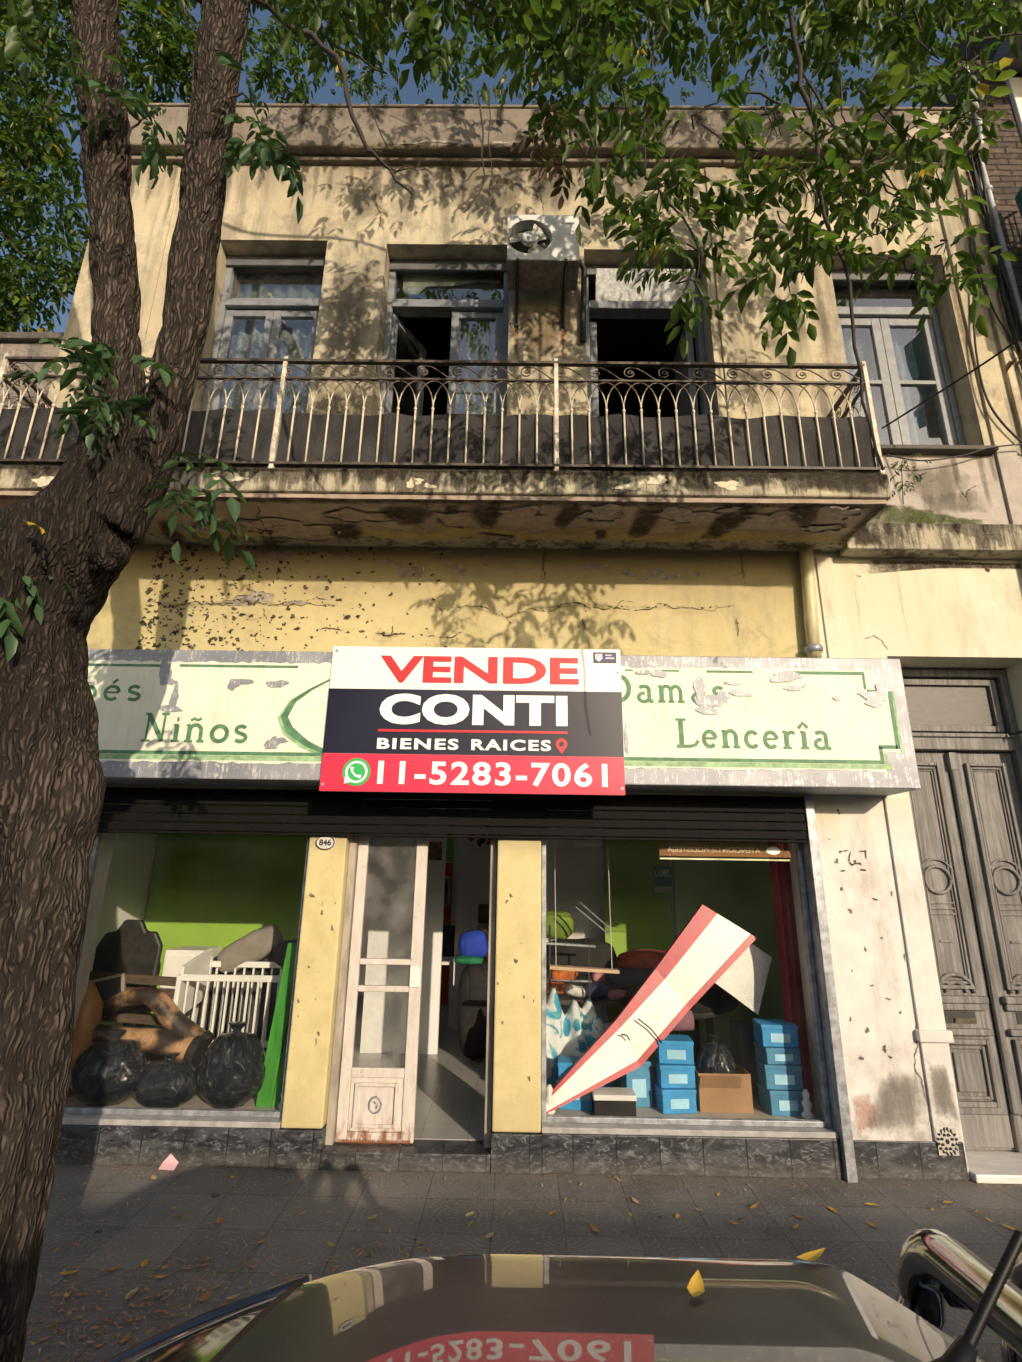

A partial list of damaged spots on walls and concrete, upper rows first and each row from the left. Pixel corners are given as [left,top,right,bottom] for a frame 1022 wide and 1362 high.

damp [515,311,565,353]
damp [171,467,892,546]
damp [913,455,971,533]
damp [135,522,381,651]
crack [378,553,744,638]
damp [871,560,1021,572]
peeling [159,656,183,712]
peeling [227,679,289,690]
peeling [693,676,754,715]
peeling [832,682,888,707]
peeling [264,736,289,749]
damp [934,1070,953,1107]